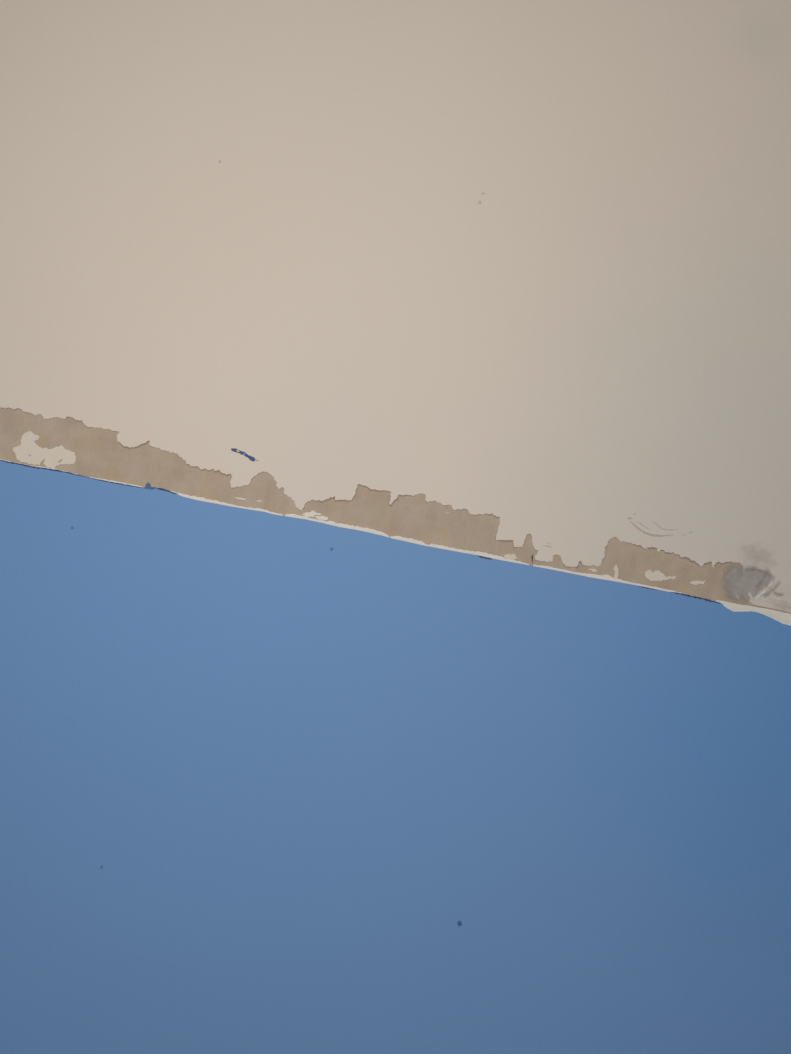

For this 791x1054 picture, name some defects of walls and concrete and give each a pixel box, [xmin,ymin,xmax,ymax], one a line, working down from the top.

peeling [0,408,791,626]